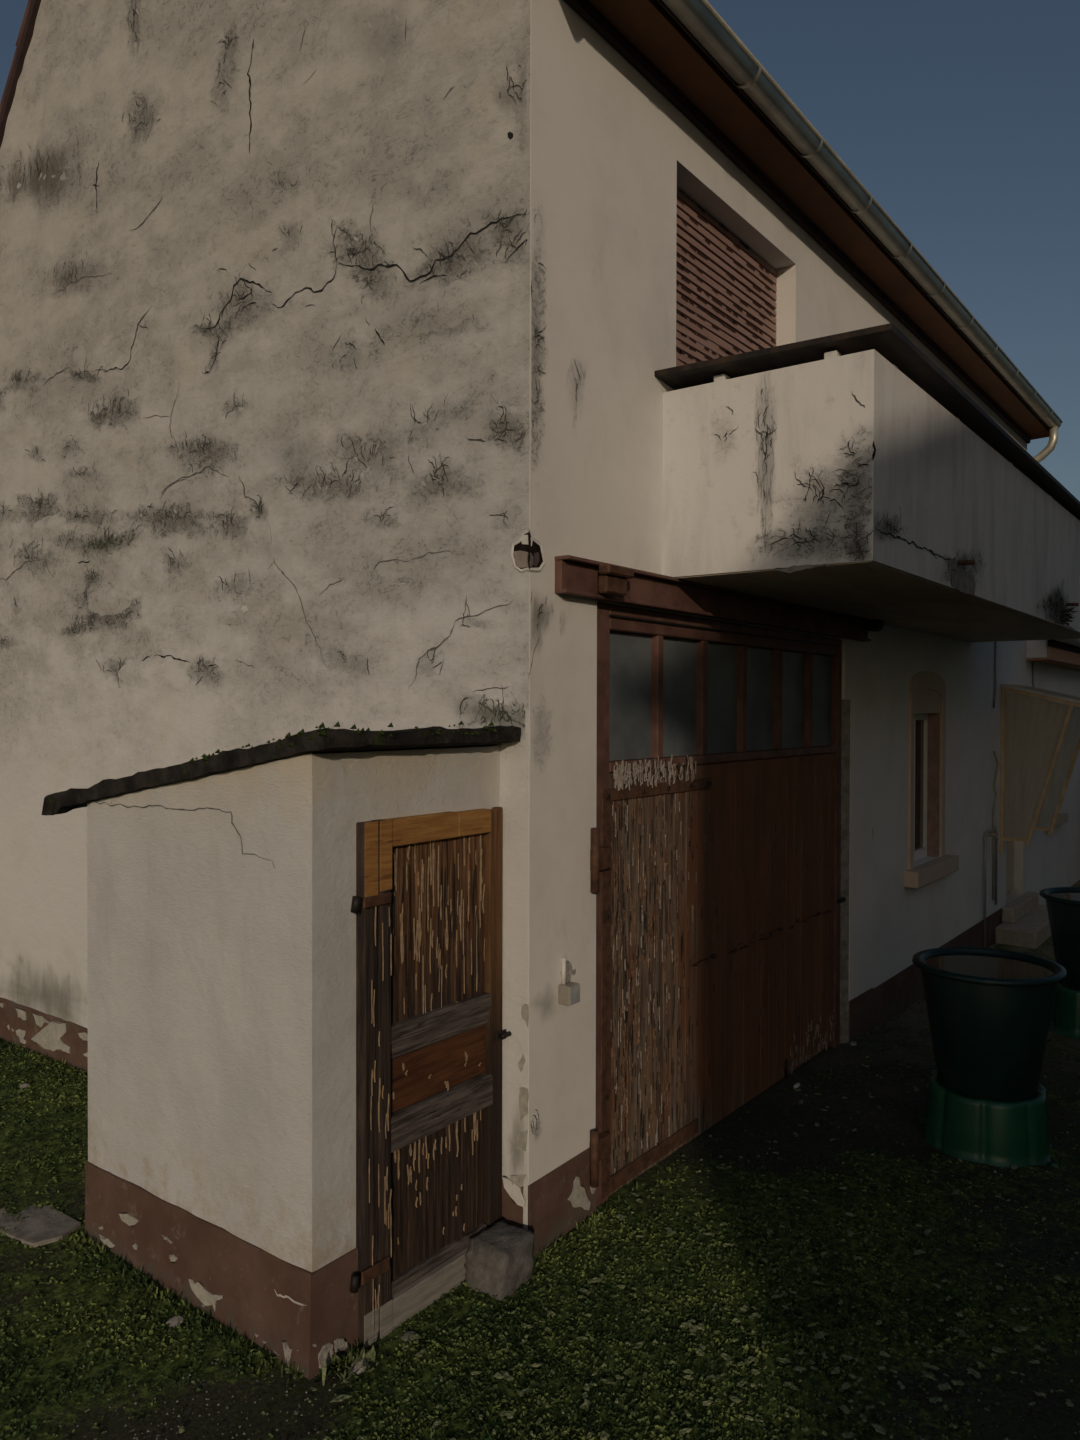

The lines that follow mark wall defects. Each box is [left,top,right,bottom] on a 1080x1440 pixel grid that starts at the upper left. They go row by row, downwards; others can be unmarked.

water stain [467,263,546,461]
crack [142,206,526,668]
water stain [284,436,449,499]
water stain [747,433,905,558]
water stain [62,568,141,636]
crack [408,594,513,689]
crack [473,634,540,692]
crack [92,801,275,868]
peeling [0,1003,88,1057]
spalling [502,1174,526,1207]
peeling [188,1278,224,1312]
spalling [254,1333,348,1371]